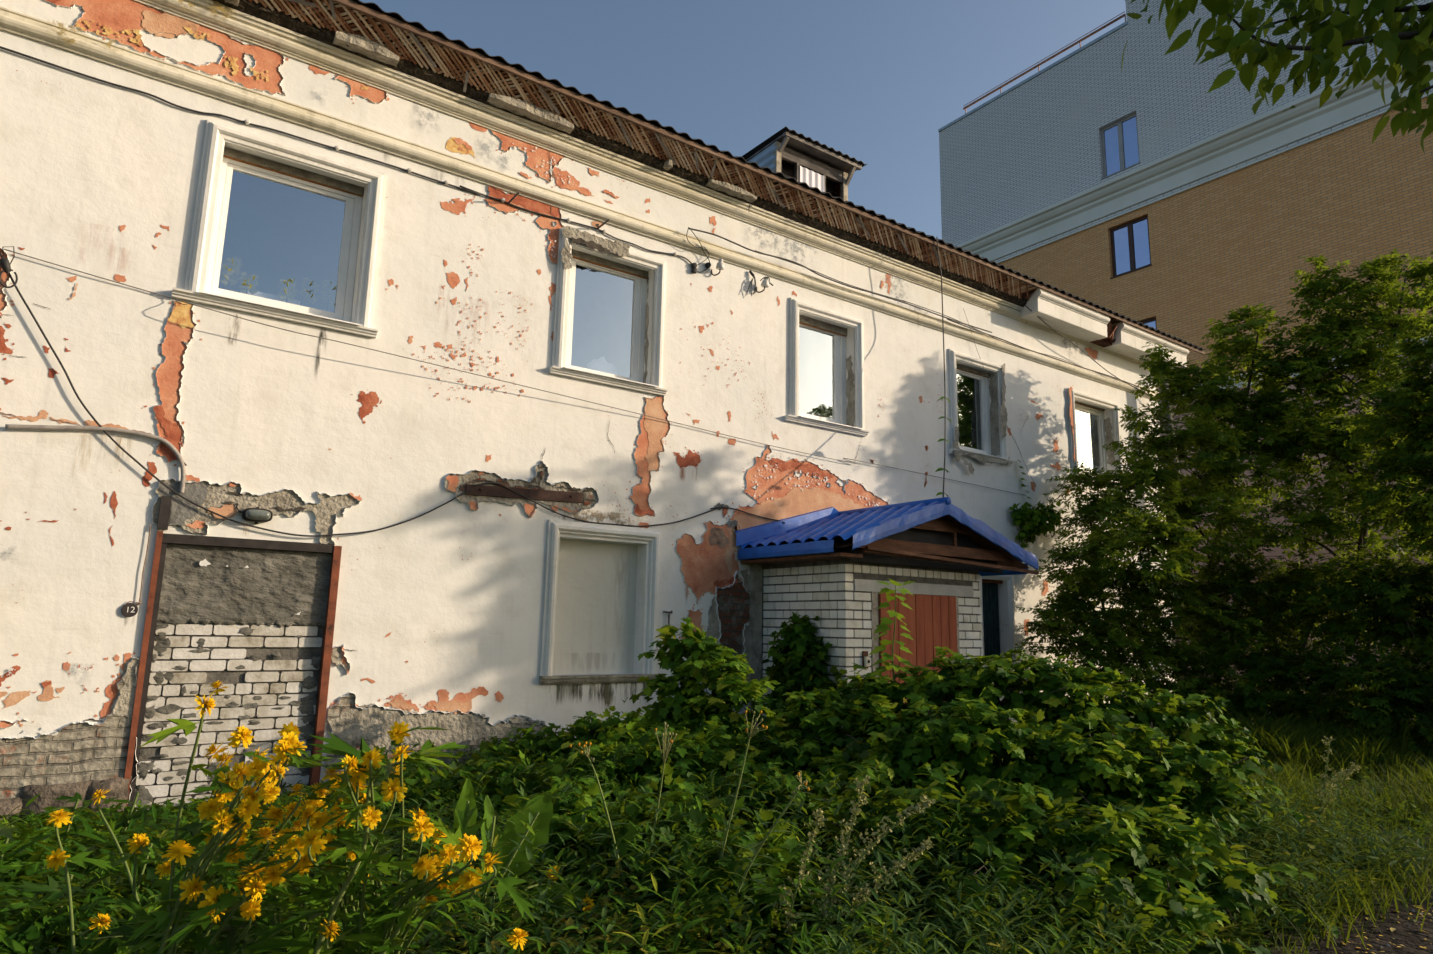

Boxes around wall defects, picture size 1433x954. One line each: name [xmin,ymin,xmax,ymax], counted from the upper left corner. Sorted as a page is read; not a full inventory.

peeling [43,0,289,96]
peeling [445,122,619,204]
peeling [0,247,25,360]
peeling [43,338,70,378]
peeling [0,408,127,429]
flaking render [142,301,362,545]
flaking render [408,186,630,403]
flaking render [443,455,599,518]
peeling [626,277,702,528]
peeling [672,432,891,685]
flaking render [0,652,140,804]
flaking render [324,644,550,782]